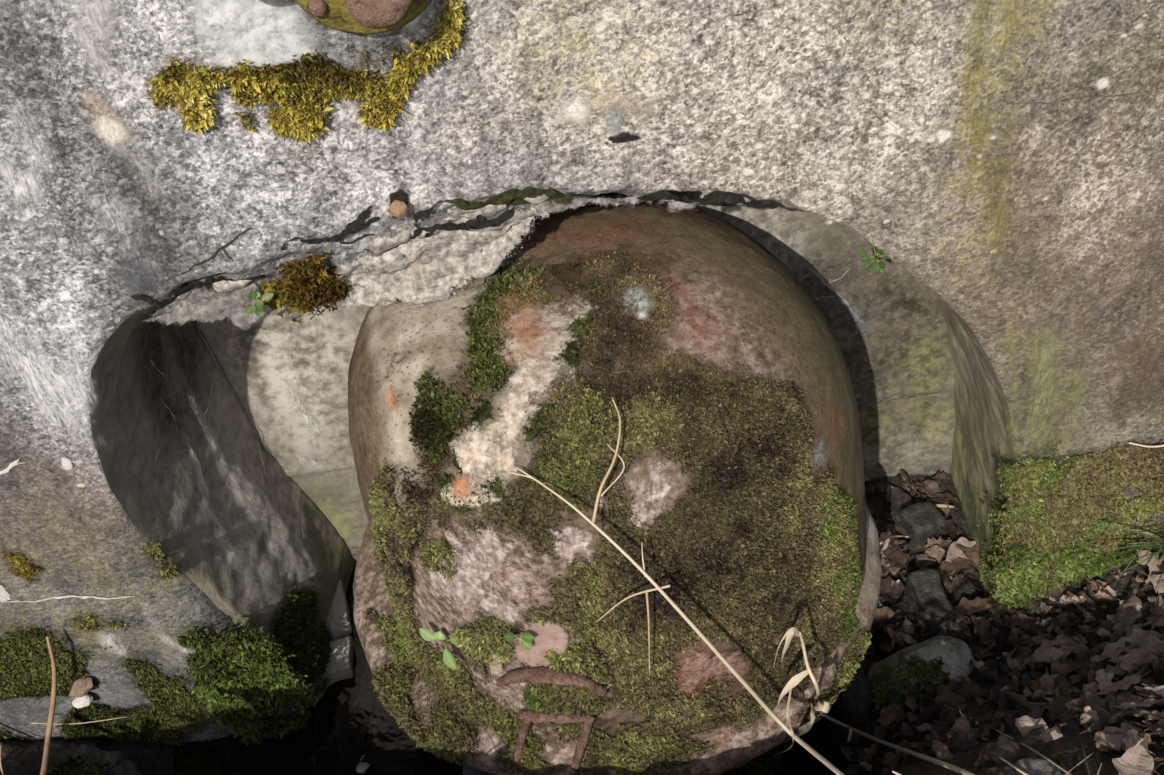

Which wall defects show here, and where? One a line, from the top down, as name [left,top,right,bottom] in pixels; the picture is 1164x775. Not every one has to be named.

crack [281,187,786,256]
crack [131,227,268,315]
spalling [145,272,265,361]